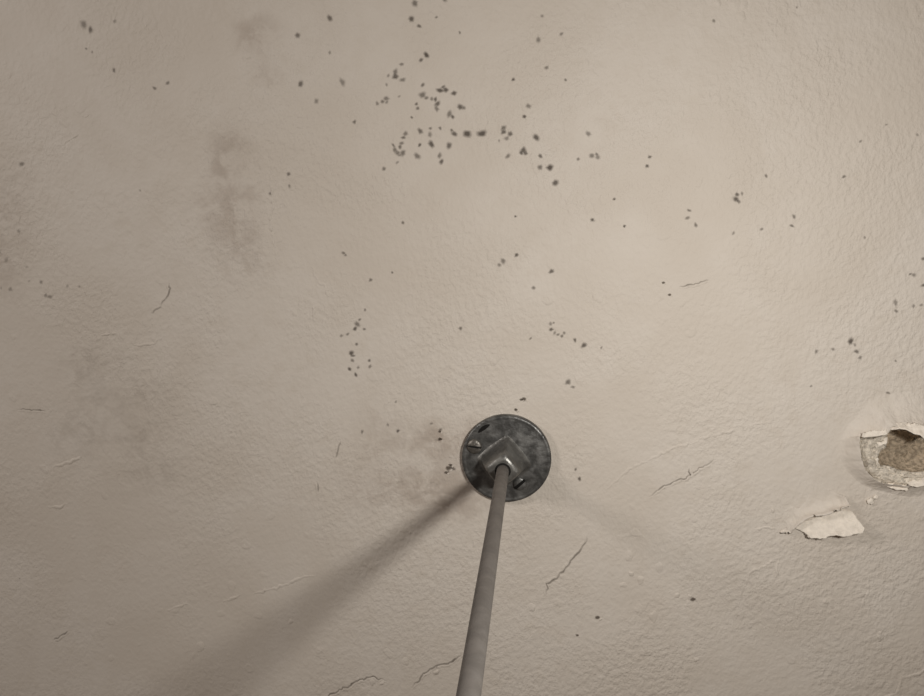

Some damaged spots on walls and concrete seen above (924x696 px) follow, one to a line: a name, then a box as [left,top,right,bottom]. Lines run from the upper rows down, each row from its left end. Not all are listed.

spalling [840,391,924,505]
peeling [778,491,865,539]